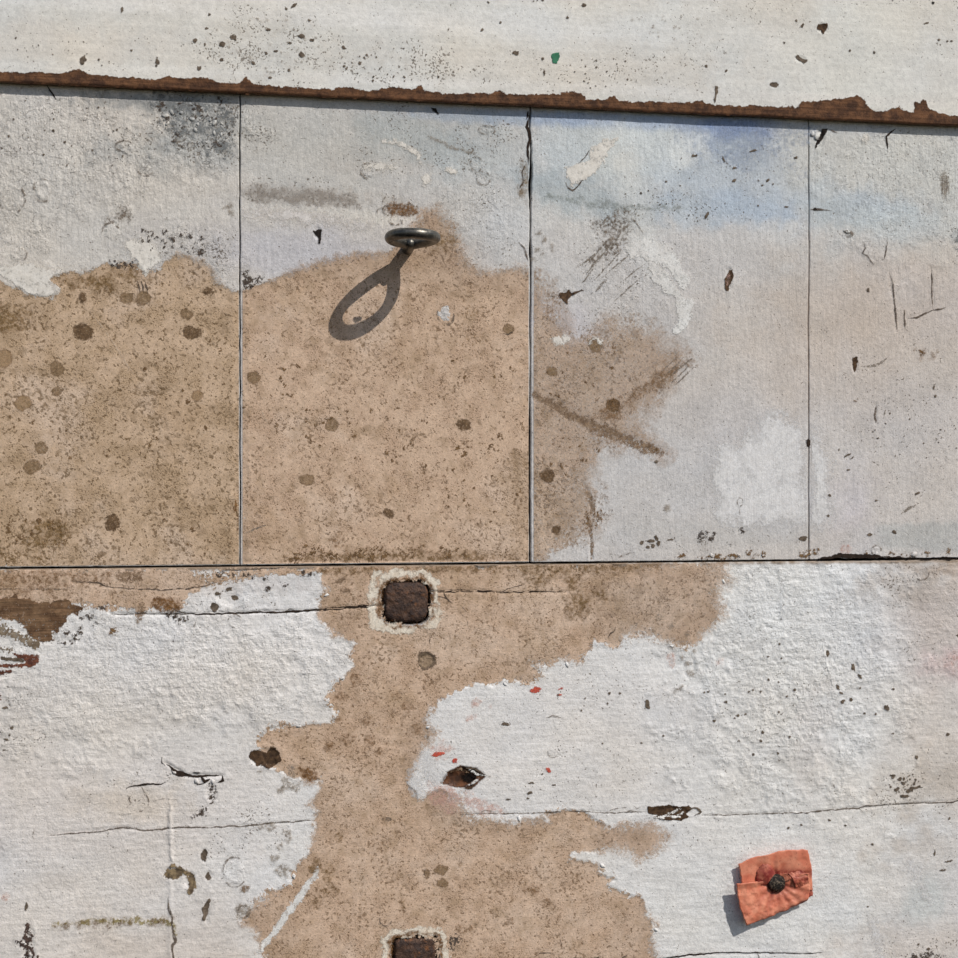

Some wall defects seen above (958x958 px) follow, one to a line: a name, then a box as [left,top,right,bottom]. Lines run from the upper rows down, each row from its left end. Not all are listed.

peeling [0,205,766,958]
rust [377,577,435,630]
crack [460,807,637,815]
crack [713,800,958,816]
rust [387,931,443,958]
crack [666,950,822,958]